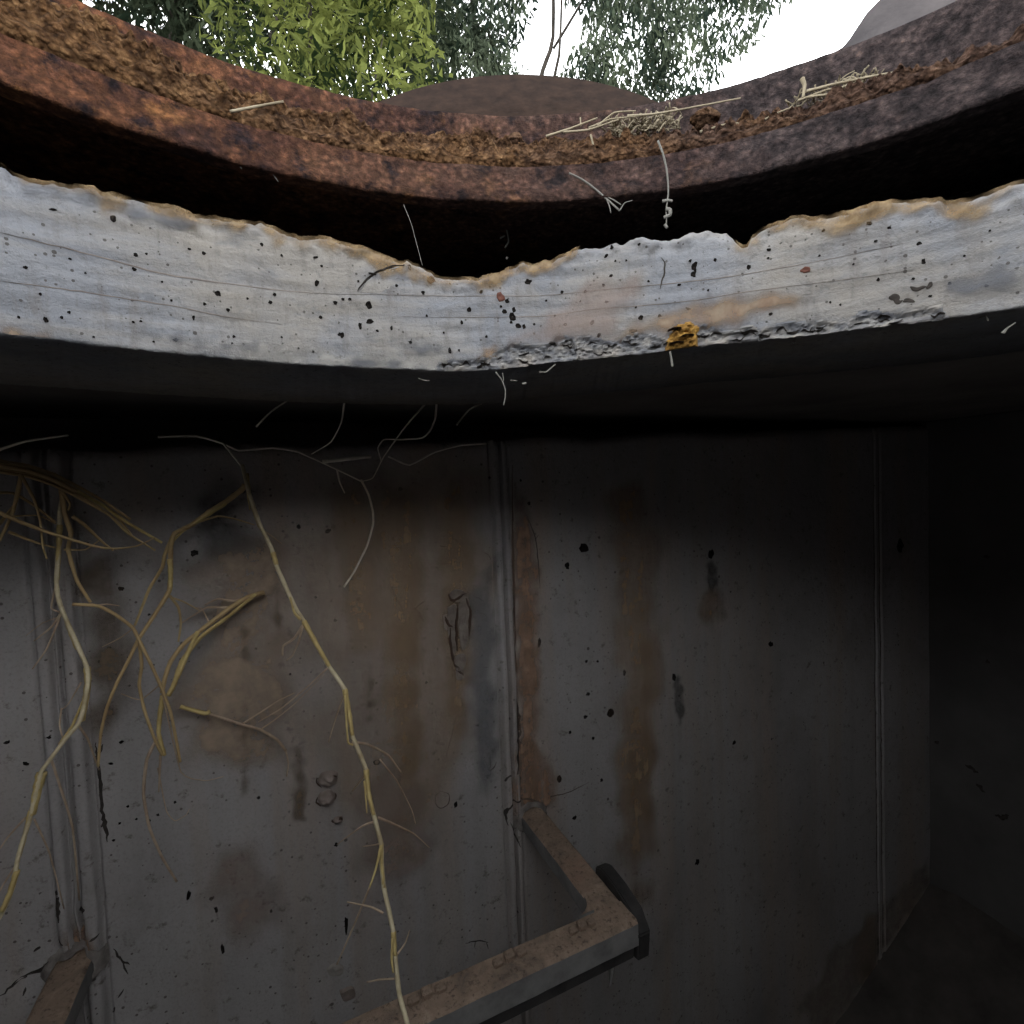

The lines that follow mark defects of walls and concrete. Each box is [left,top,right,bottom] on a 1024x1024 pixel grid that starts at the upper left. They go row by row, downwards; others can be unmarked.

spalling [435,332,668,372]
corrosion [653,294,796,351]
crack [95,743,109,842]
crack [0,937,63,996]
crack [89,933,130,1012]